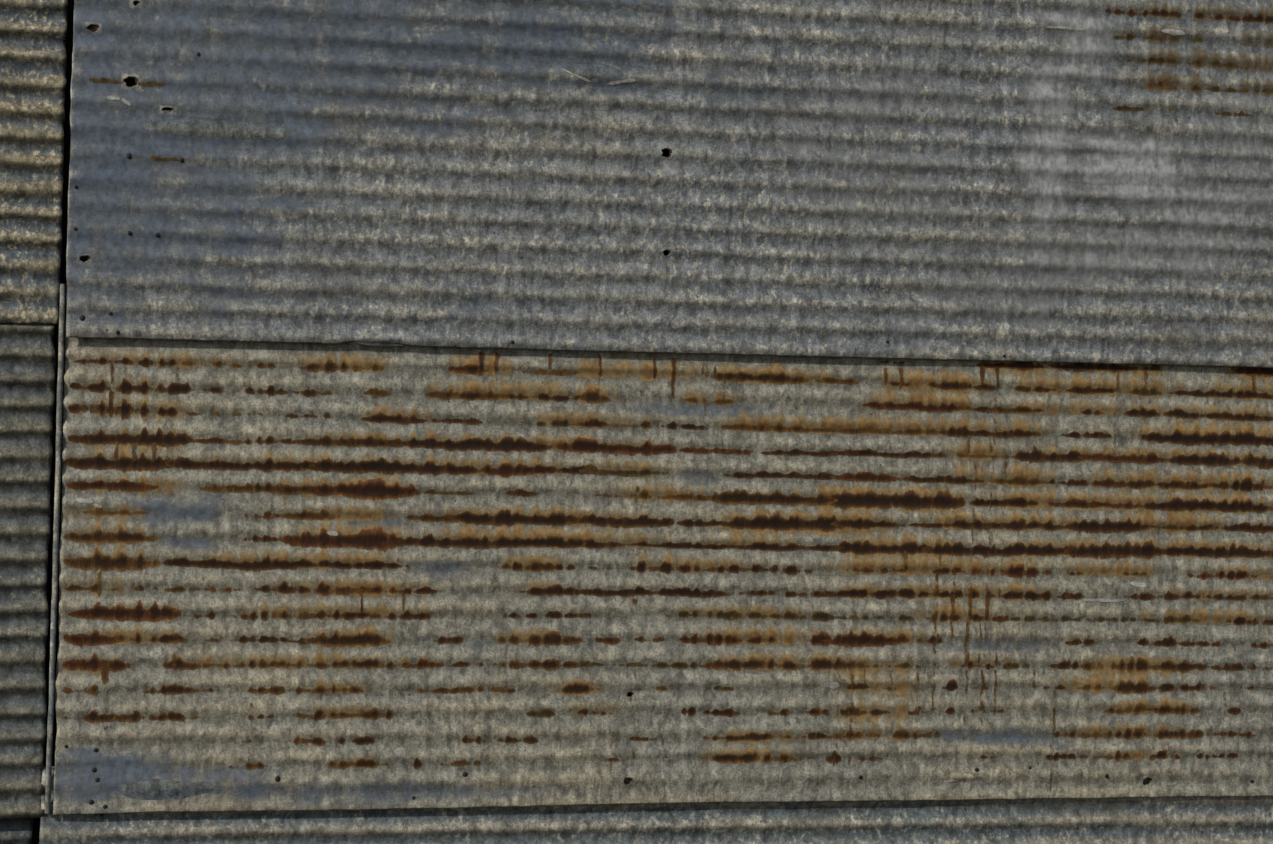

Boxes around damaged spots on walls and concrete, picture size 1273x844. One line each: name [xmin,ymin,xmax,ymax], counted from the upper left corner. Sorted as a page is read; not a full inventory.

corrosion [62,352,1273,791]